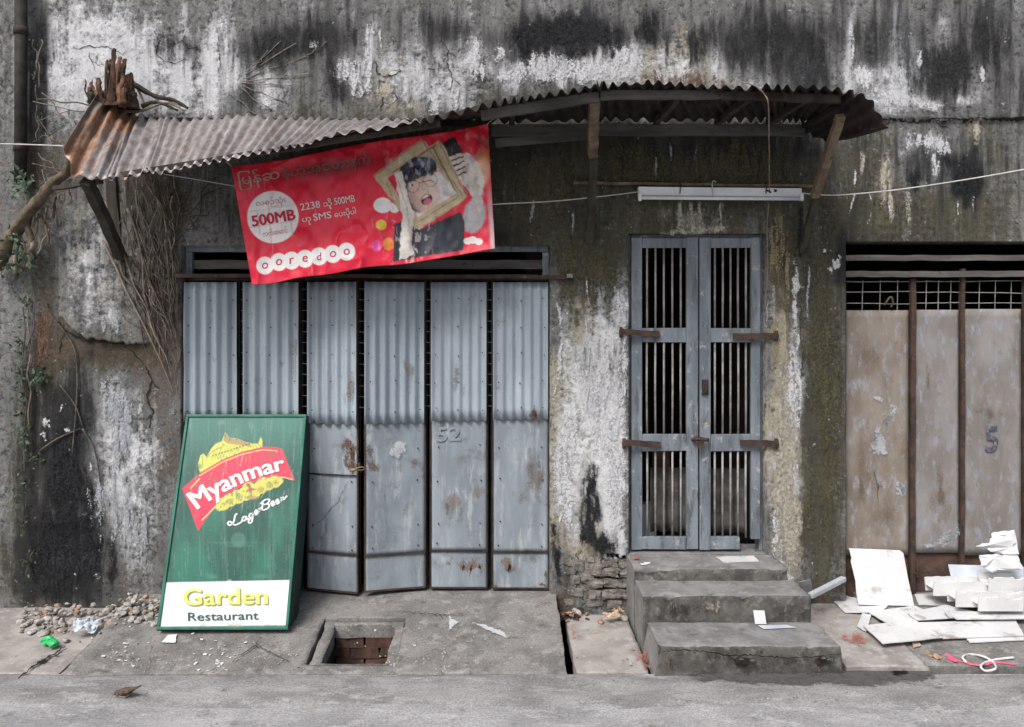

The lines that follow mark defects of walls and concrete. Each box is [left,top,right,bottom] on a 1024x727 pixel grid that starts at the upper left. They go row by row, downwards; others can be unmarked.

leakage [251,24,382,100]
flaking render [337,57,404,99]
flaking render [407,83,459,115]
flaking render [464,37,516,83]
leakage [509,9,669,86]
leakage [849,21,1002,111]
crack [48,304,159,429]
leakage [513,137,794,554]
leakage [765,207,841,574]
leakage [30,379,149,598]
rust [341,438,378,474]
spalling [564,554,627,609]